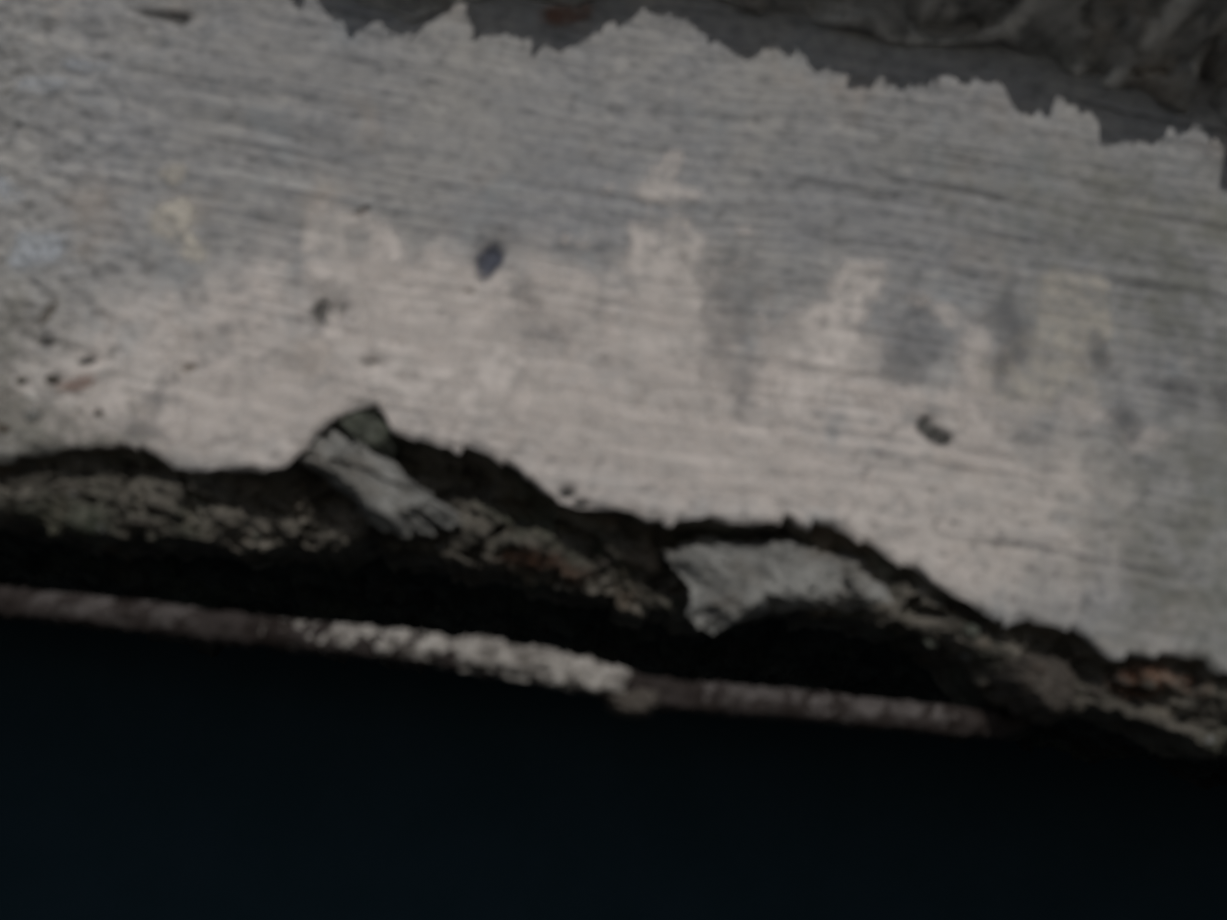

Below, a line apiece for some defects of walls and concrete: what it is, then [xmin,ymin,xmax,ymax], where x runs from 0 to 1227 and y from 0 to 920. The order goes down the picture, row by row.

spalling [0,405,1227,759]